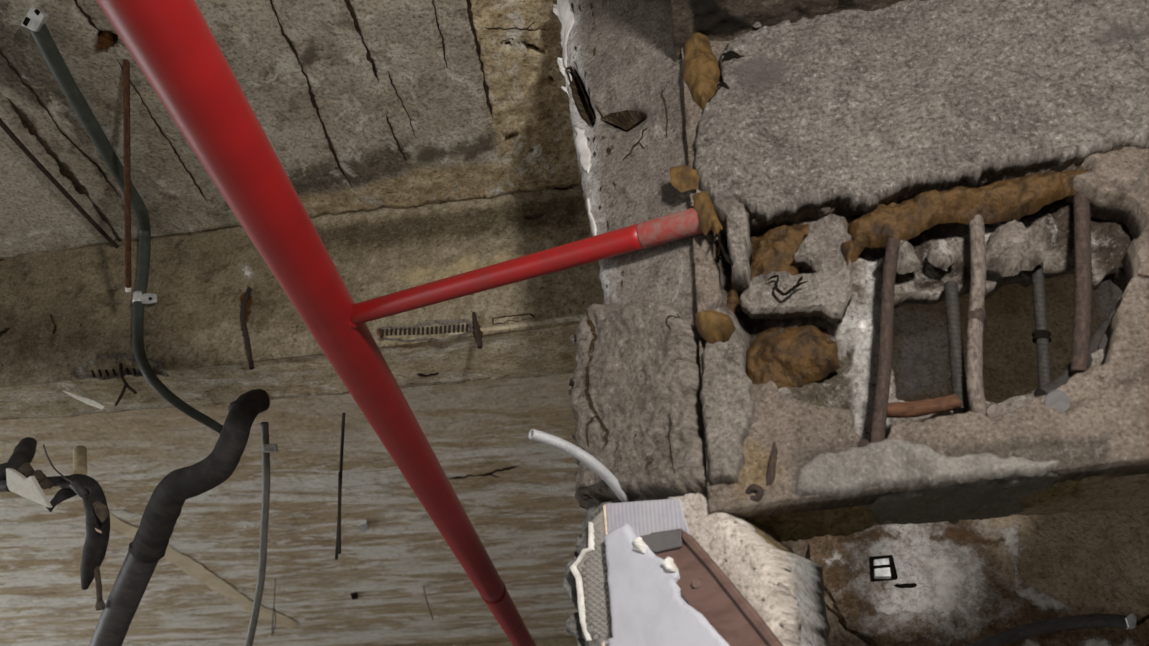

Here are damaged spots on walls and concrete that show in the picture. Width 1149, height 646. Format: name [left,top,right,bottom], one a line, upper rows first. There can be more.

crack [0,51,121,241]
crack [74,0,100,32]
corrosion [95,32,112,53]
crack [270,0,352,187]
crack [344,0,416,161]
crack [466,0,545,118]
peeling [586,198,597,236]
crack [524,45,668,228]
peeling [553,0,646,174]
spalling [744,191,1133,443]
leakage [826,528,900,586]
leakage [858,524,1066,619]